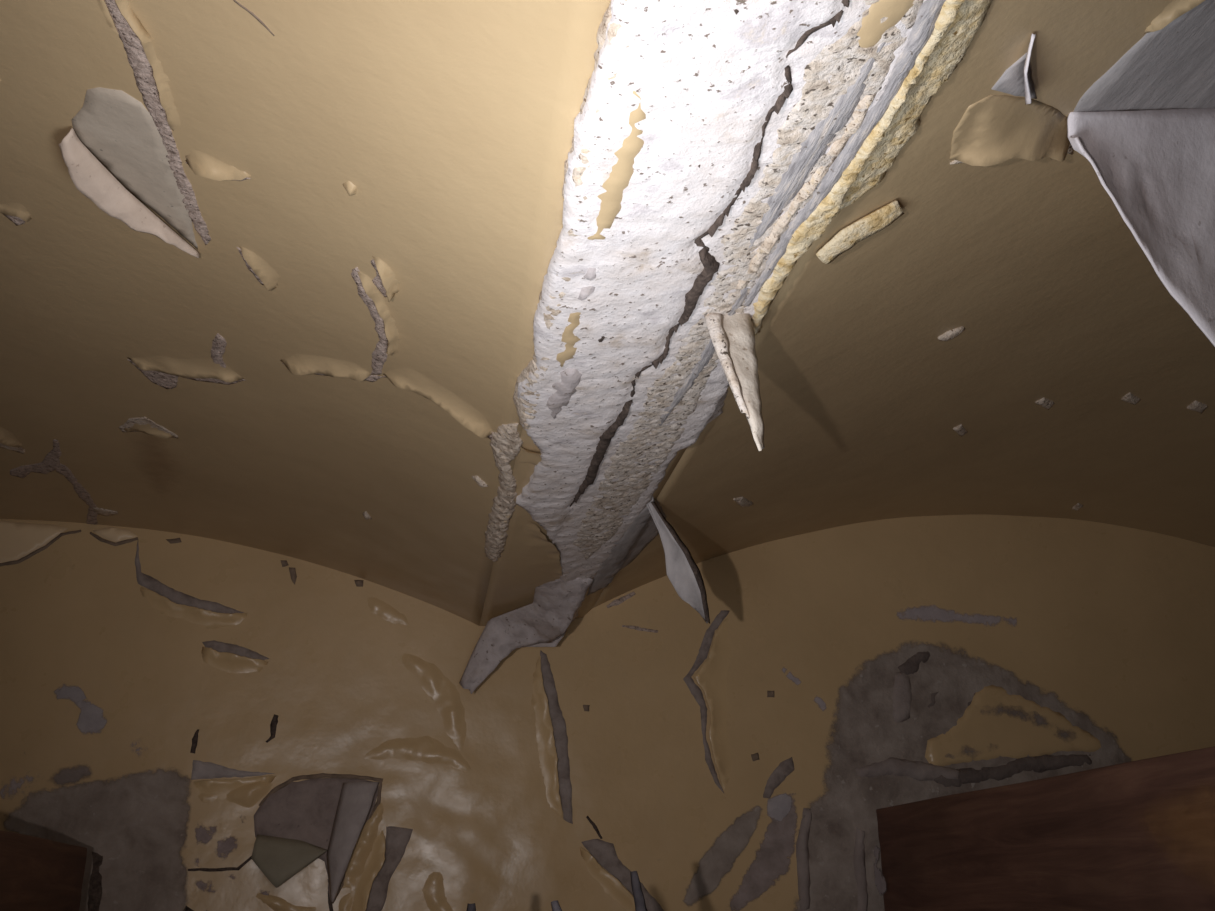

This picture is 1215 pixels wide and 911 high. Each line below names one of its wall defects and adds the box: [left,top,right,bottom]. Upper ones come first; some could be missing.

peeling [58,87,200,258]
crack [97,0,211,245]
peeling [949,0,1215,347]
flaking render [472,0,992,624]
peeling [0,521,269,673]
peeling [188,729,413,911]
peeling [531,651,573,824]
peeling [580,839,664,911]
peeling [684,757,797,911]
spalling [898,651,930,675]